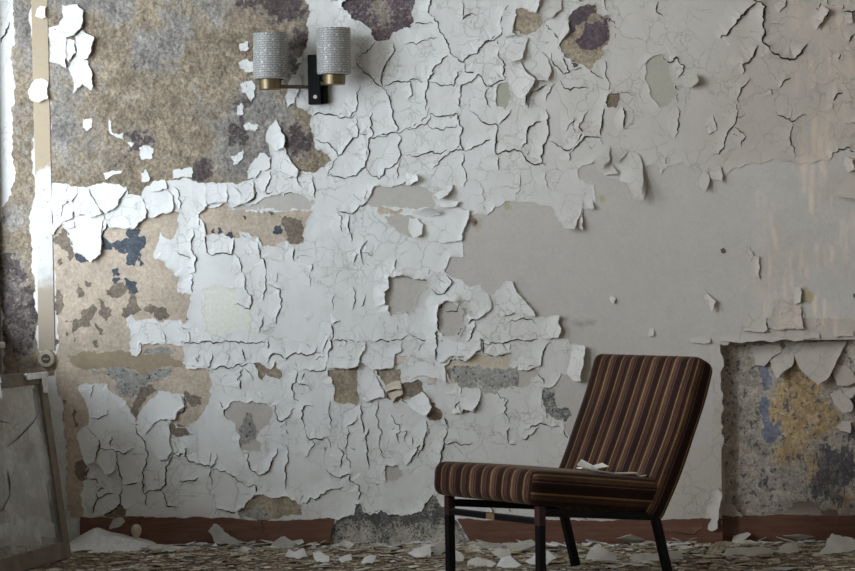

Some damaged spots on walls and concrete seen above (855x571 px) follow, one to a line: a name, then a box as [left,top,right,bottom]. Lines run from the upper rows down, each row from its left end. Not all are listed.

peeling [332,0,422,53]
crack [241,0,636,241]
peeling [488,0,619,113]
peeling [596,84,628,117]
crack [646,1,668,20]
peeling [634,47,684,116]
crack [656,0,855,164]
peeling [0,0,333,529]
crack [84,185,569,535]
peeling [319,146,855,531]
crack [529,517,596,532]